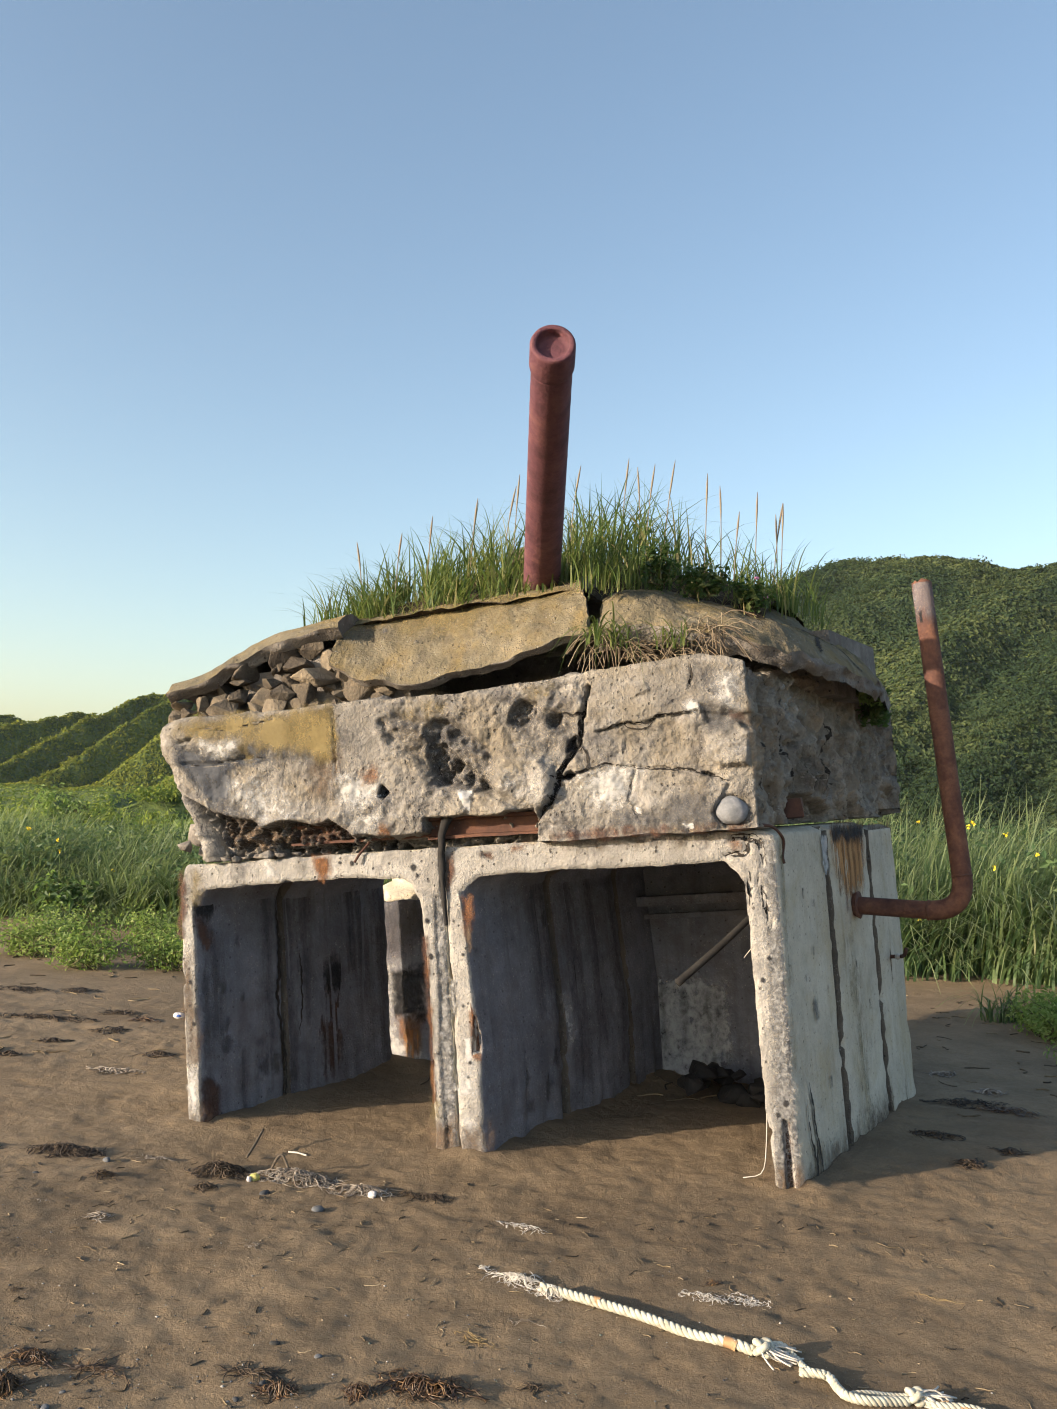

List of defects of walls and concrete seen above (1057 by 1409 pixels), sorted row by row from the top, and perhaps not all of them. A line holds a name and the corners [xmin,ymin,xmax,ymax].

crack [539,667,832,820]
corrosion [313,857,328,877]
corrosion [830,822,890,898]
corrosion [202,1078,220,1122]